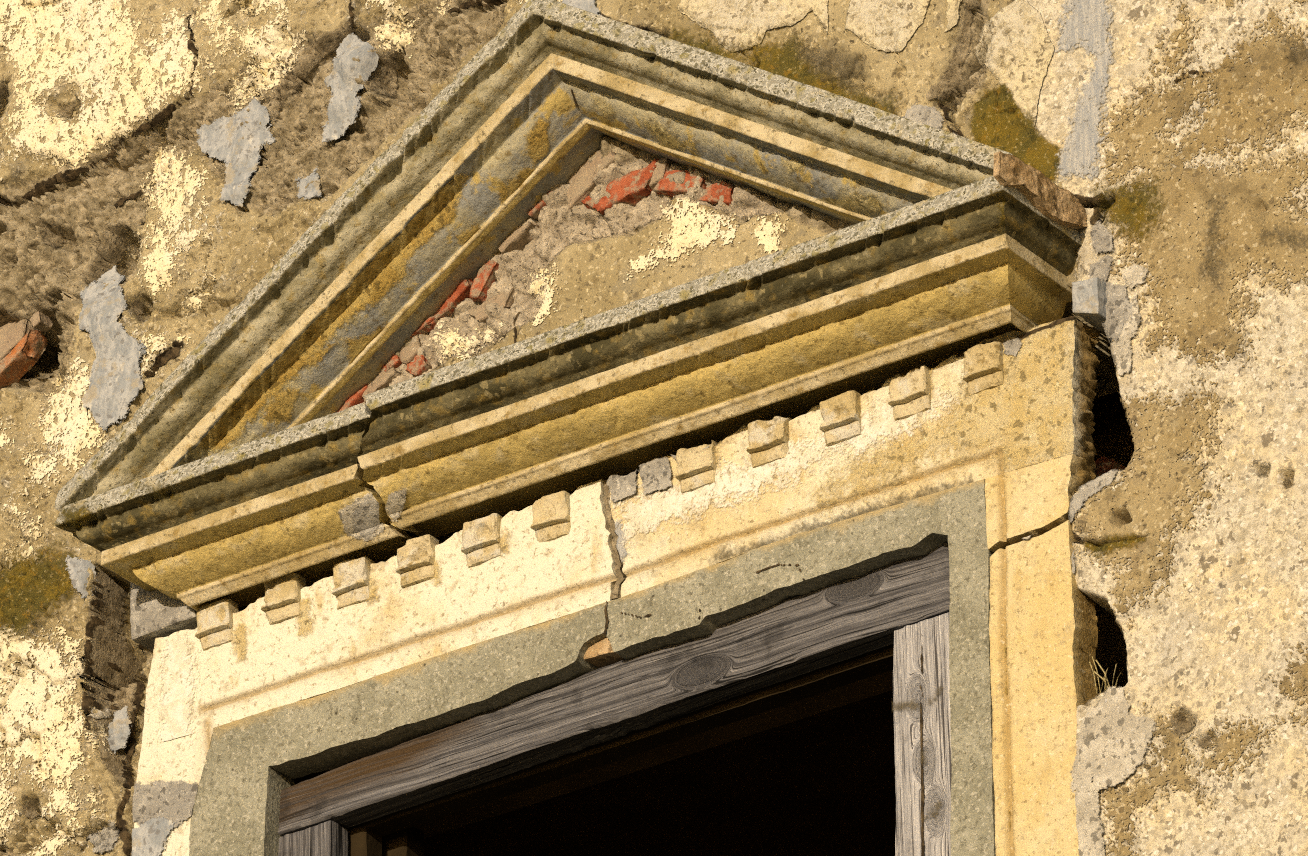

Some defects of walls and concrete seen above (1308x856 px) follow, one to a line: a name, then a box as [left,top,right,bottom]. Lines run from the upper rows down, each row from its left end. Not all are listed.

flaking render [677,0,828,52]
flaking render [844,0,930,53]
flaking render [944,0,962,32]
water stain [801,48,864,87]
peeling [0,0,451,568]
spalling [336,150,788,413]
crack [603,480,651,635]